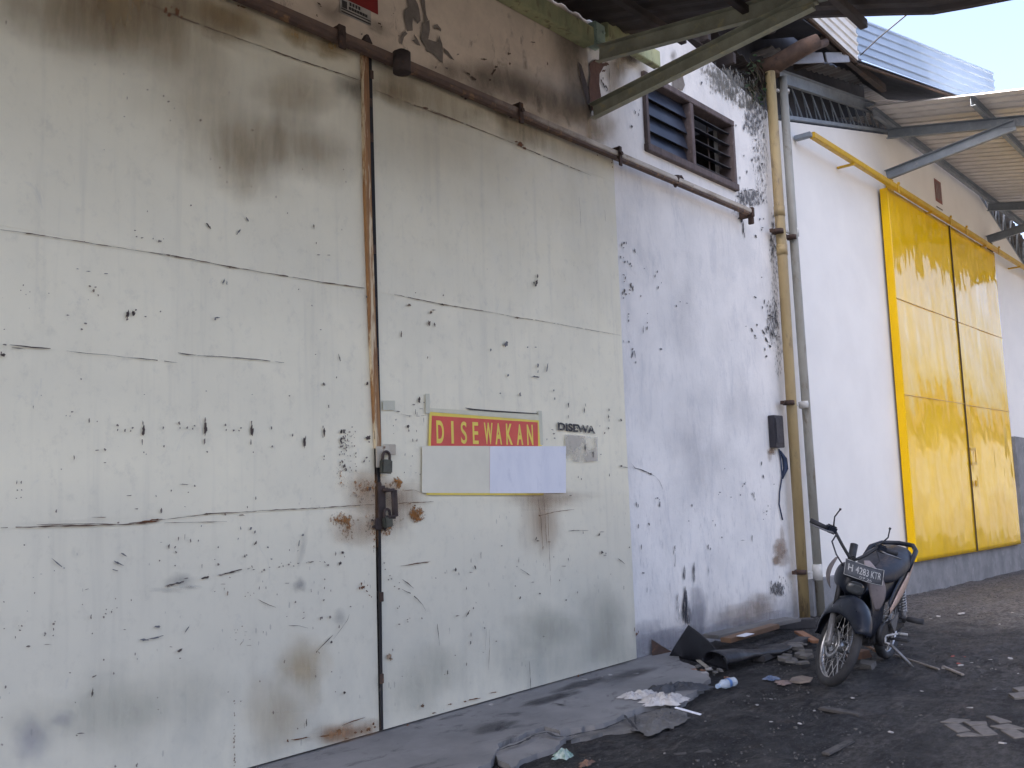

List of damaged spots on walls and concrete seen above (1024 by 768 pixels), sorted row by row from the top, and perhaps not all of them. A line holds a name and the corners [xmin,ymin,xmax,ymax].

peeling [393,0,459,69]
leakage [702,64,768,211]
leakage [766,215,781,376]
corrosion [337,470,403,503]
corrosion [330,511,392,551]
corrosion [410,506,424,522]
corrosion [287,718,376,742]